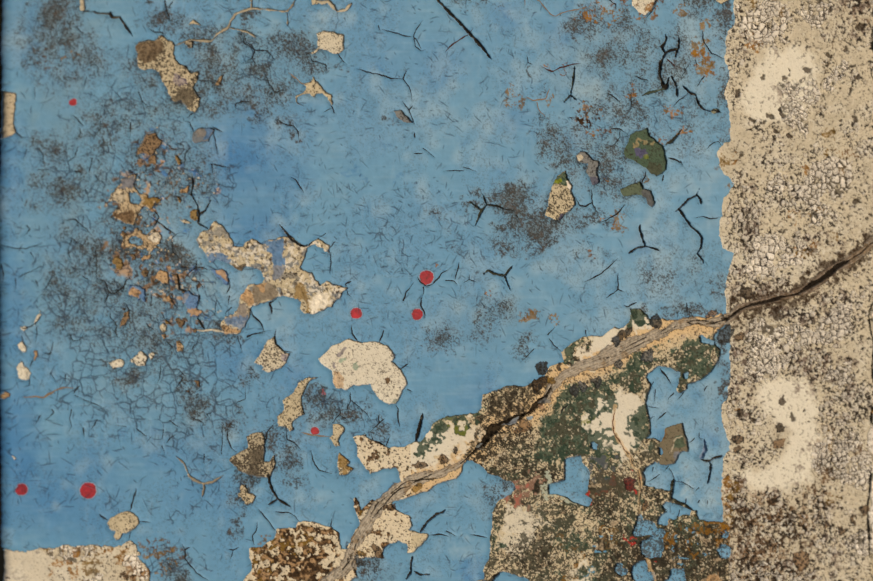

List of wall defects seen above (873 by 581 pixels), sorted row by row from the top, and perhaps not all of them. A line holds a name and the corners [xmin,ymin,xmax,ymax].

peeling [135,36,201,113]
crack [525,57,580,116]
crack [608,31,730,113]
peeling [624,128,668,176]
peeling [109,174,203,339]
peeling [197,222,348,335]
crack [675,189,719,264]
crack [264,389,424,474]
peeling [244,309,731,581]
crack [321,225,873,581]
peeling [3,511,150,581]
crack [228,472,298,559]